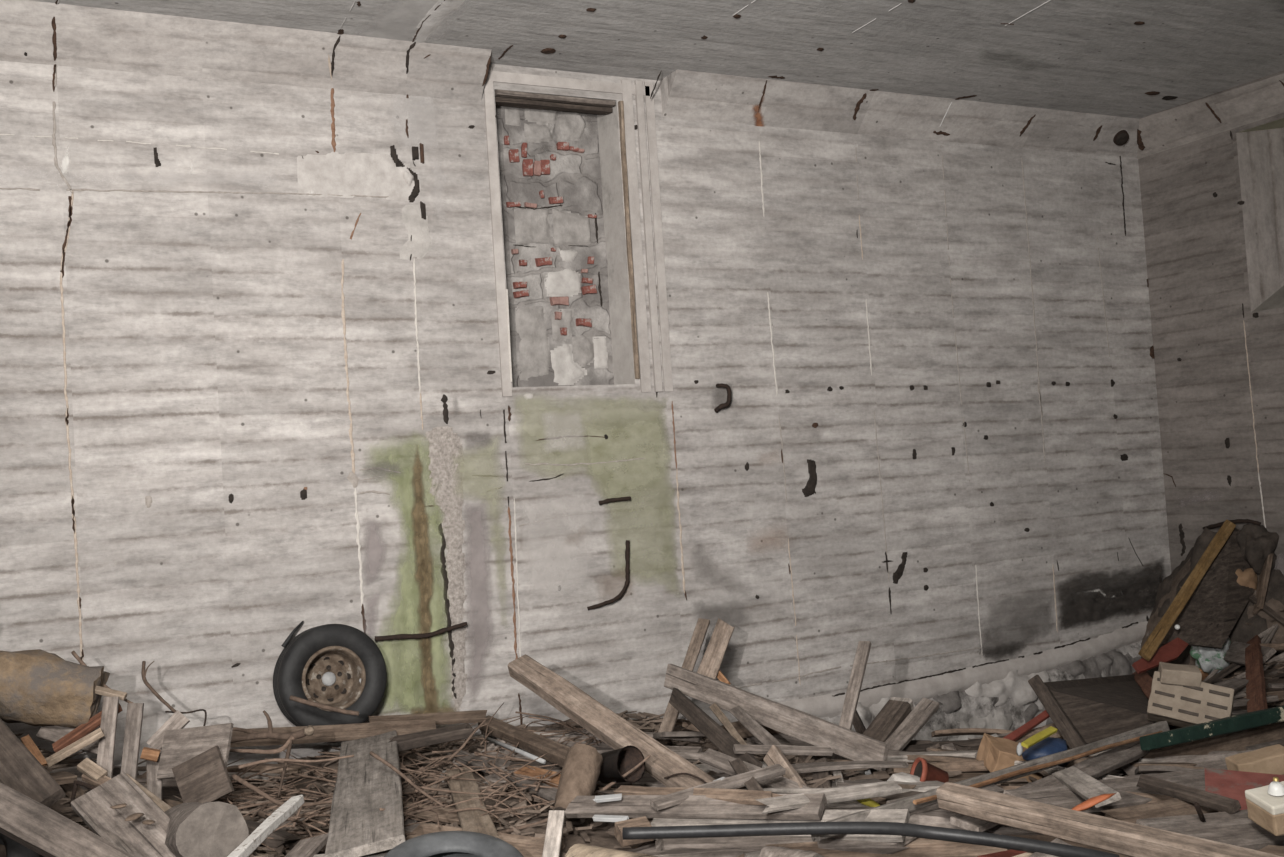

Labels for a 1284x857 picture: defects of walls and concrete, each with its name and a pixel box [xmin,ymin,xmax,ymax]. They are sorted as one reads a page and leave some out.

crack [405,0,445,166]
crack [0,0,401,660]
crack [410,235,449,430]
corrosion [412,455,455,725]
crack [425,505,457,699]
water stain [468,508,490,693]
crack [480,392,687,659]
water stain [984,563,1164,657]
crack [516,693,524,724]